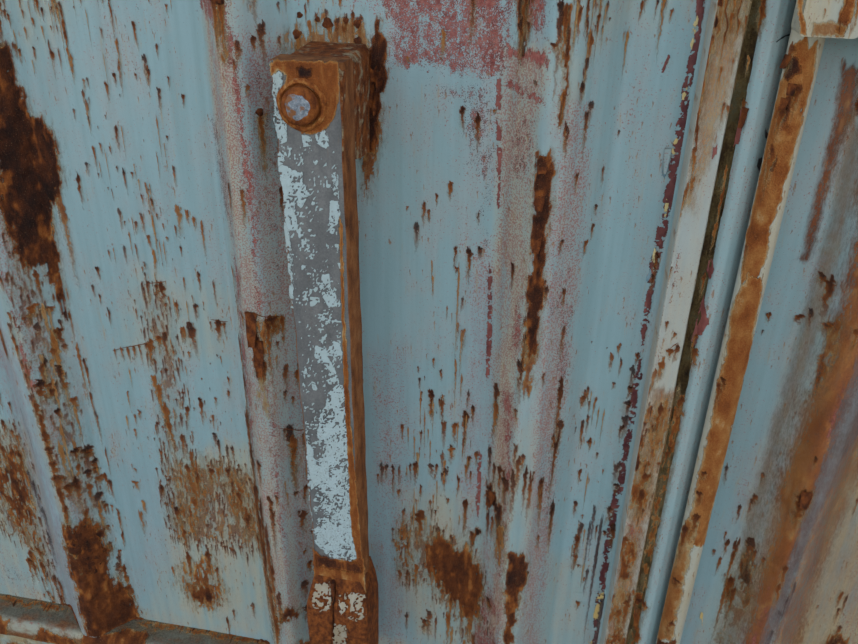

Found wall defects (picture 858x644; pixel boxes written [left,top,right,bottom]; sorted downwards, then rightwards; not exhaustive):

rust [0,0,308,644]
peeling [200,0,357,562]
rust [301,217,366,592]
rust [414,181,453,240]
peeling [380,0,553,212]
rust [377,246,564,644]
peeling [485,265,493,381]
rust [517,0,533,66]
rust [517,149,556,397]
rust [550,0,611,148]
rust [571,469,607,581]
peeling [588,0,705,644]